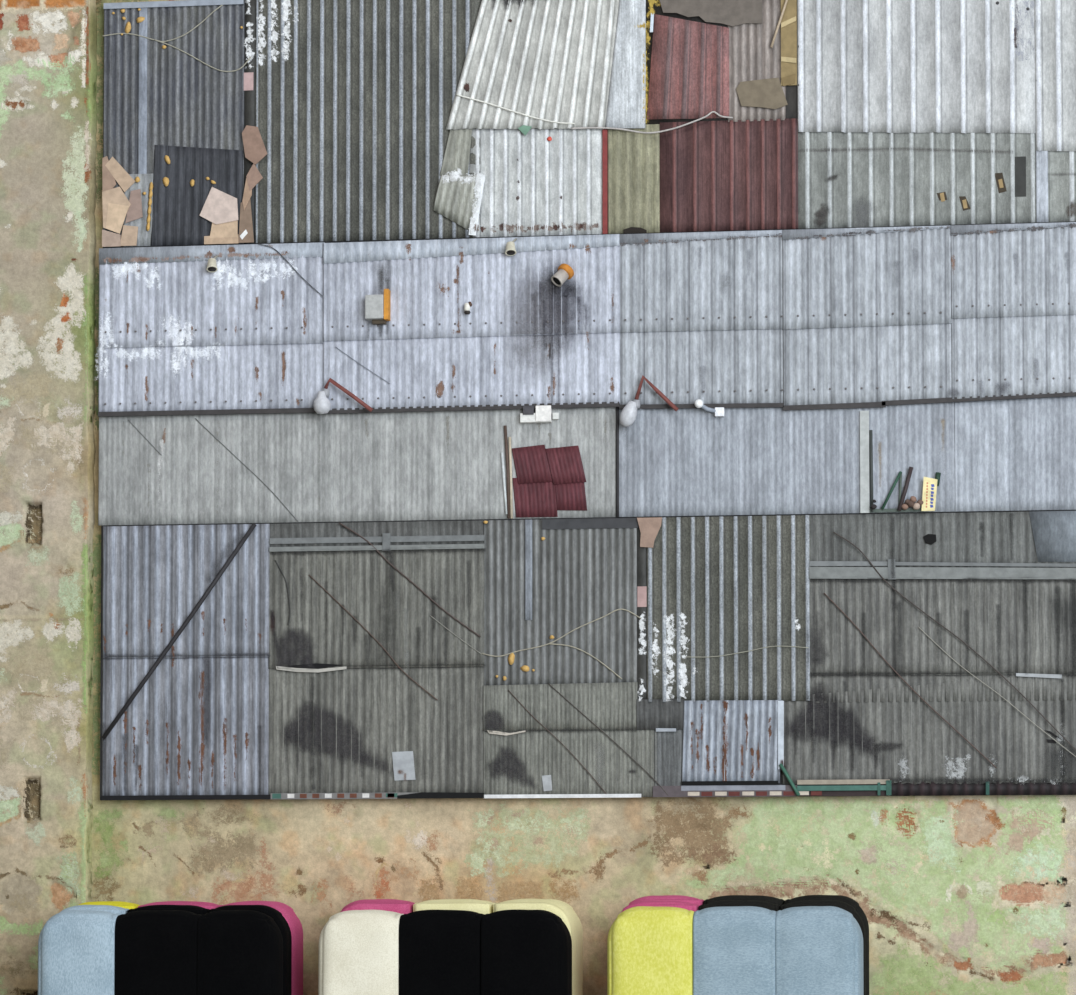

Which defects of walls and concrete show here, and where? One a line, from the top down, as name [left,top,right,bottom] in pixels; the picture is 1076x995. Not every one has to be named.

spalling [0,0,223,458]
peeling [211,257,298,291]
spalling [31,421,89,535]
peeling [0,784,51,846]
peeling [662,724,1074,995]